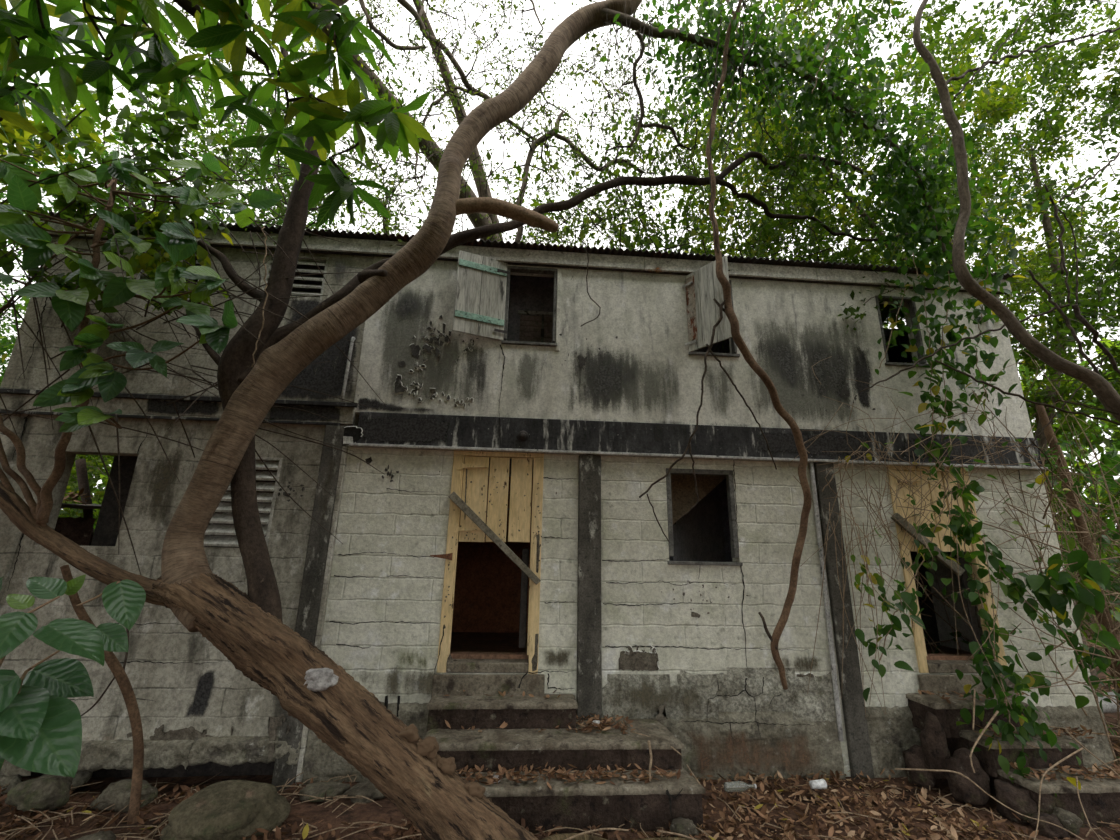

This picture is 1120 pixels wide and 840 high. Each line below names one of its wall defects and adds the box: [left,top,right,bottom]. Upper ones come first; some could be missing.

peeling [394,315,480,409]
water stain [577,351,678,439]
water stain [735,322,871,456]
crack [602,463,814,743]